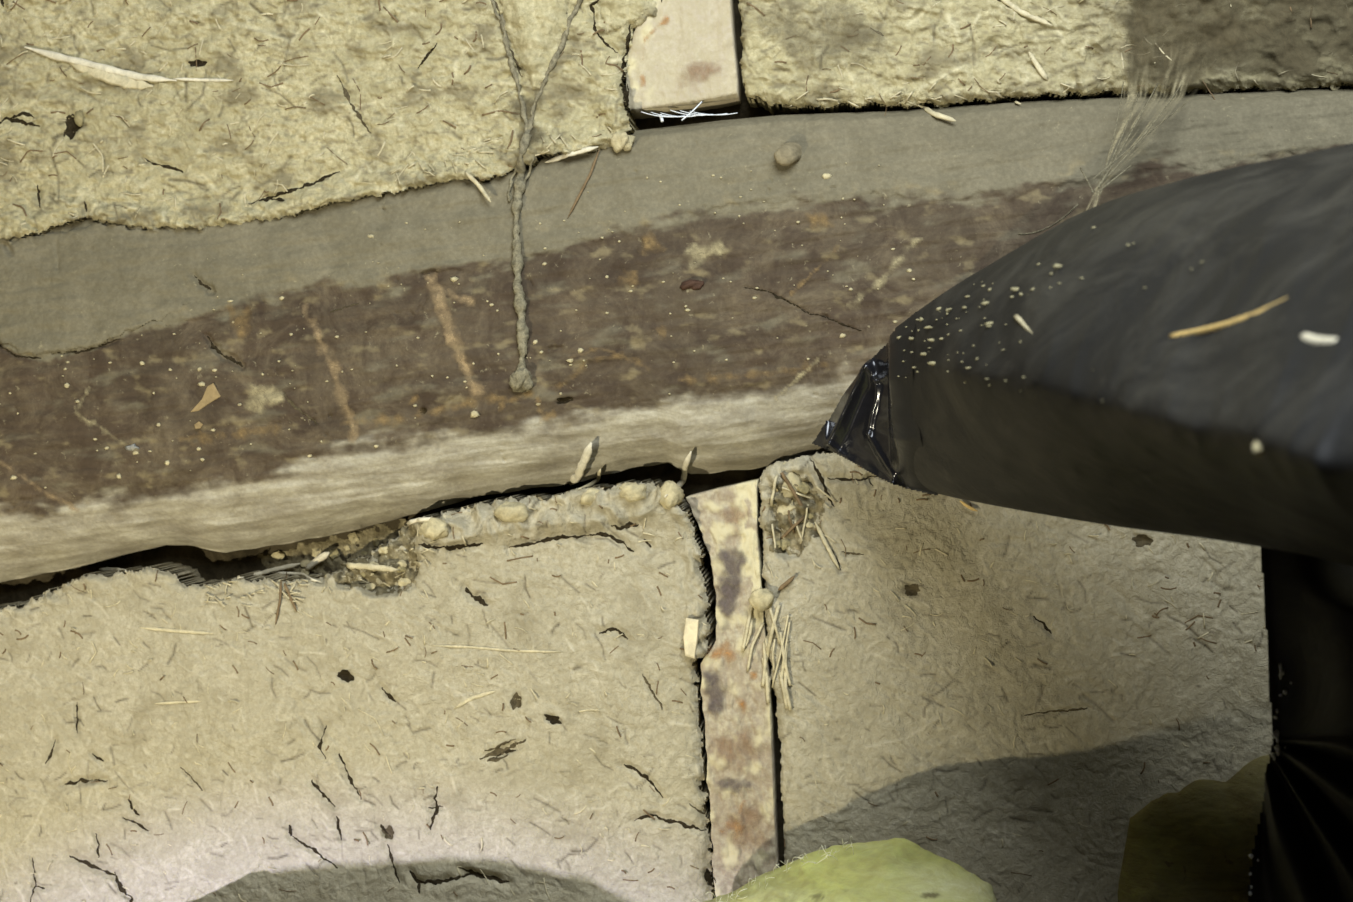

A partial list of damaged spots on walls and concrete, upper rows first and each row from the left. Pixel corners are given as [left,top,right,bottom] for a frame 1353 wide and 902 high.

crack [418,521,651,552]
crack [465,587,488,606]